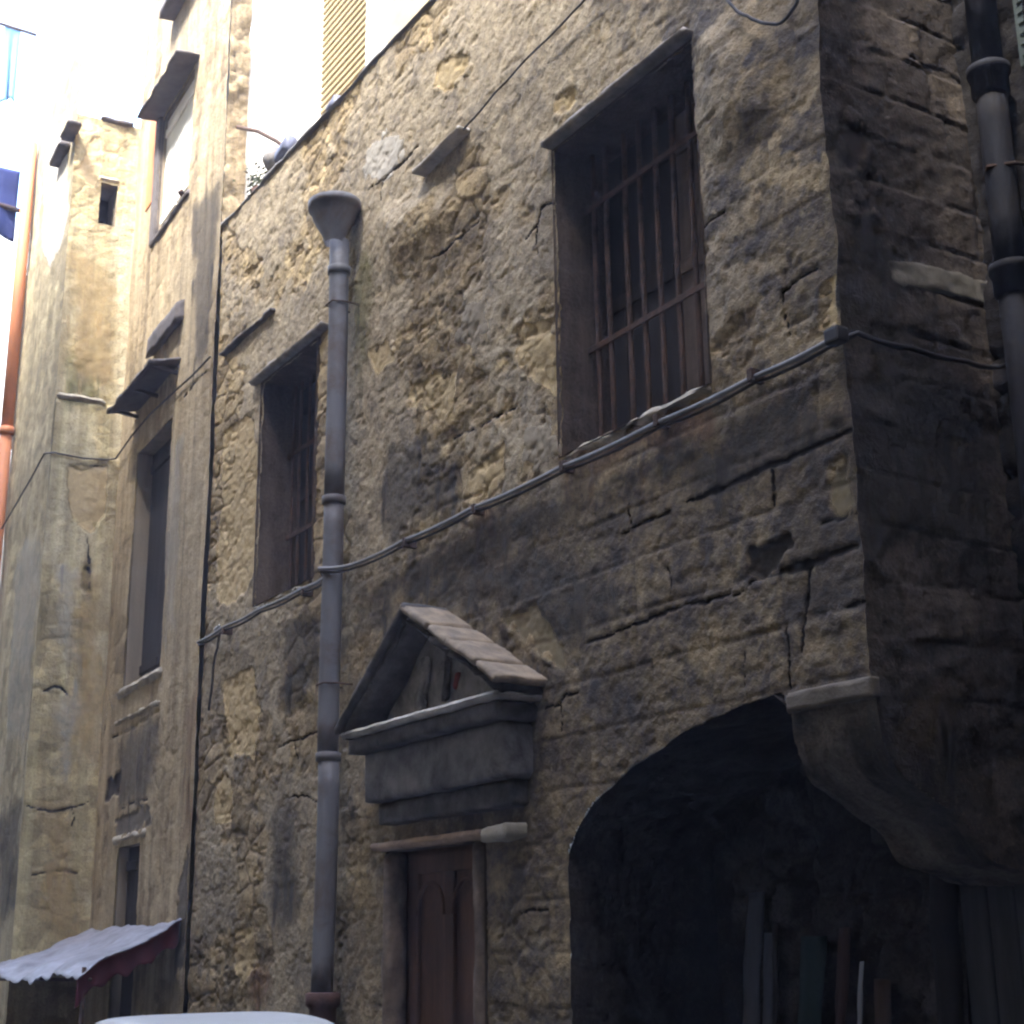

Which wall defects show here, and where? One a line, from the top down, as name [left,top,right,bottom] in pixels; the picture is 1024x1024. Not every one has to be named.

crack [525,202,555,253]
spalling [747,532,795,593]
crack [588,544,860,689]
crack [24,684,68,764]
crack [27,801,89,827]